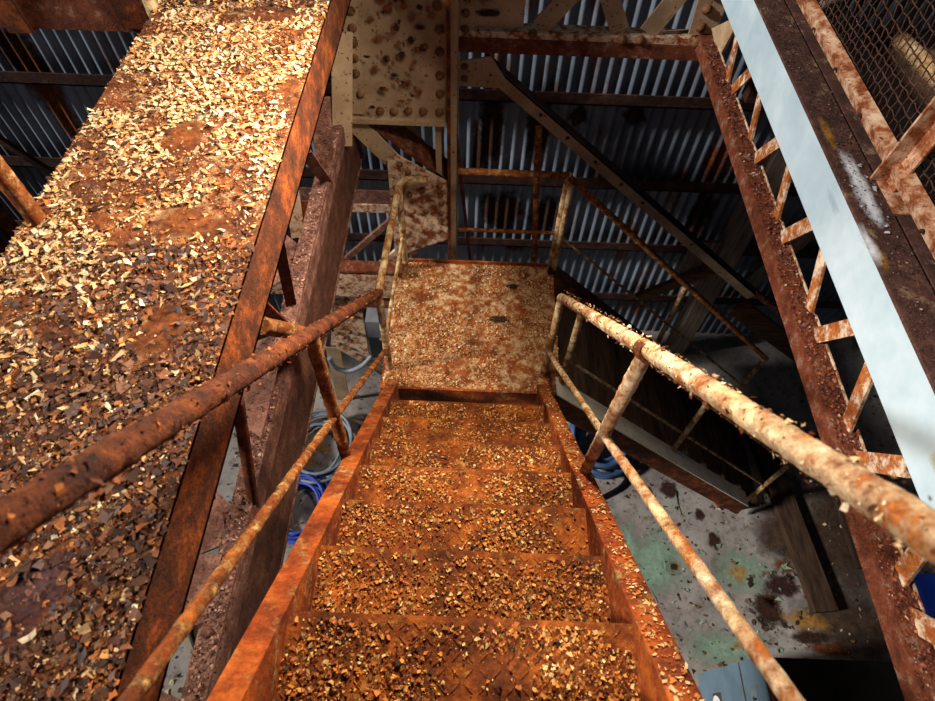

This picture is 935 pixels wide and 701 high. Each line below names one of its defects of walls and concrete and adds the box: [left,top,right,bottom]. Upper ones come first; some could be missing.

rust [0,27,52,73]
rust [26,84,81,137]
rust [79,0,325,204]
rust [363,0,435,111]
rust [0,164,94,276]
rust [107,158,259,325]
rust [481,190,560,231]
rust [55,266,126,377]
rust [124,342,220,428]
rust [30,421,80,464]
rust [382,218,705,701]
rust [53,584,126,701]